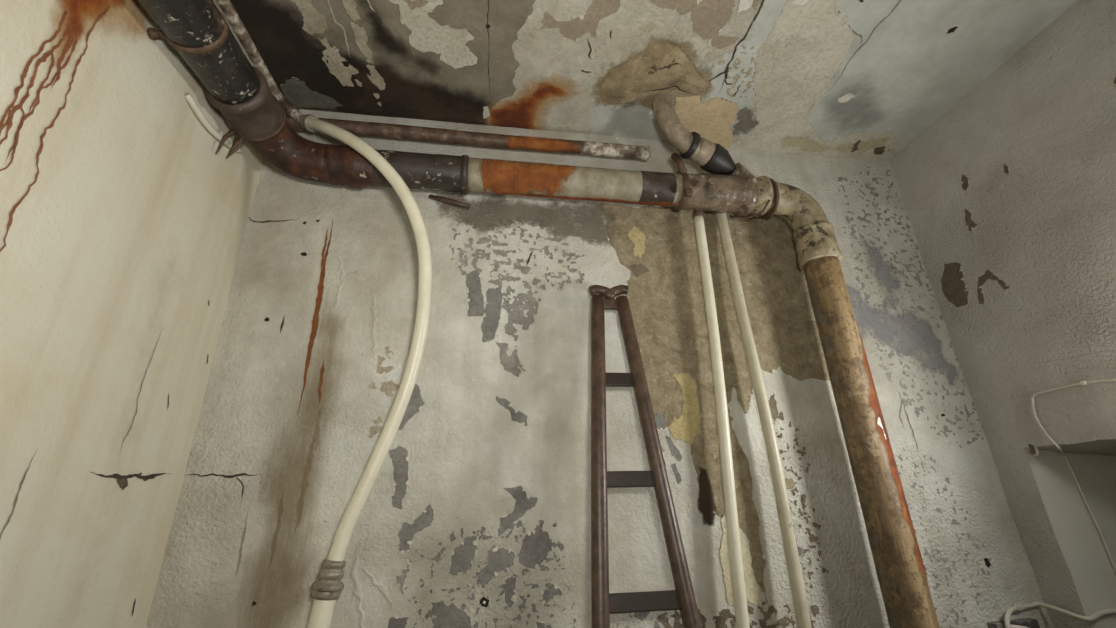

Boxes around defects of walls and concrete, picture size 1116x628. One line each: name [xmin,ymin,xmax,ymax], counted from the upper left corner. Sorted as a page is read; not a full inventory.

rust [0,0,144,252]
rust [481,82,675,207]
peeling [266,0,1011,449]
crack [709,0,765,97]
crack [118,329,162,464]
crack [185,473,261,496]
rust [297,219,333,415]
peeling [386,446,576,628]
flaking render [599,203,830,628]
peeling [894,448,992,628]